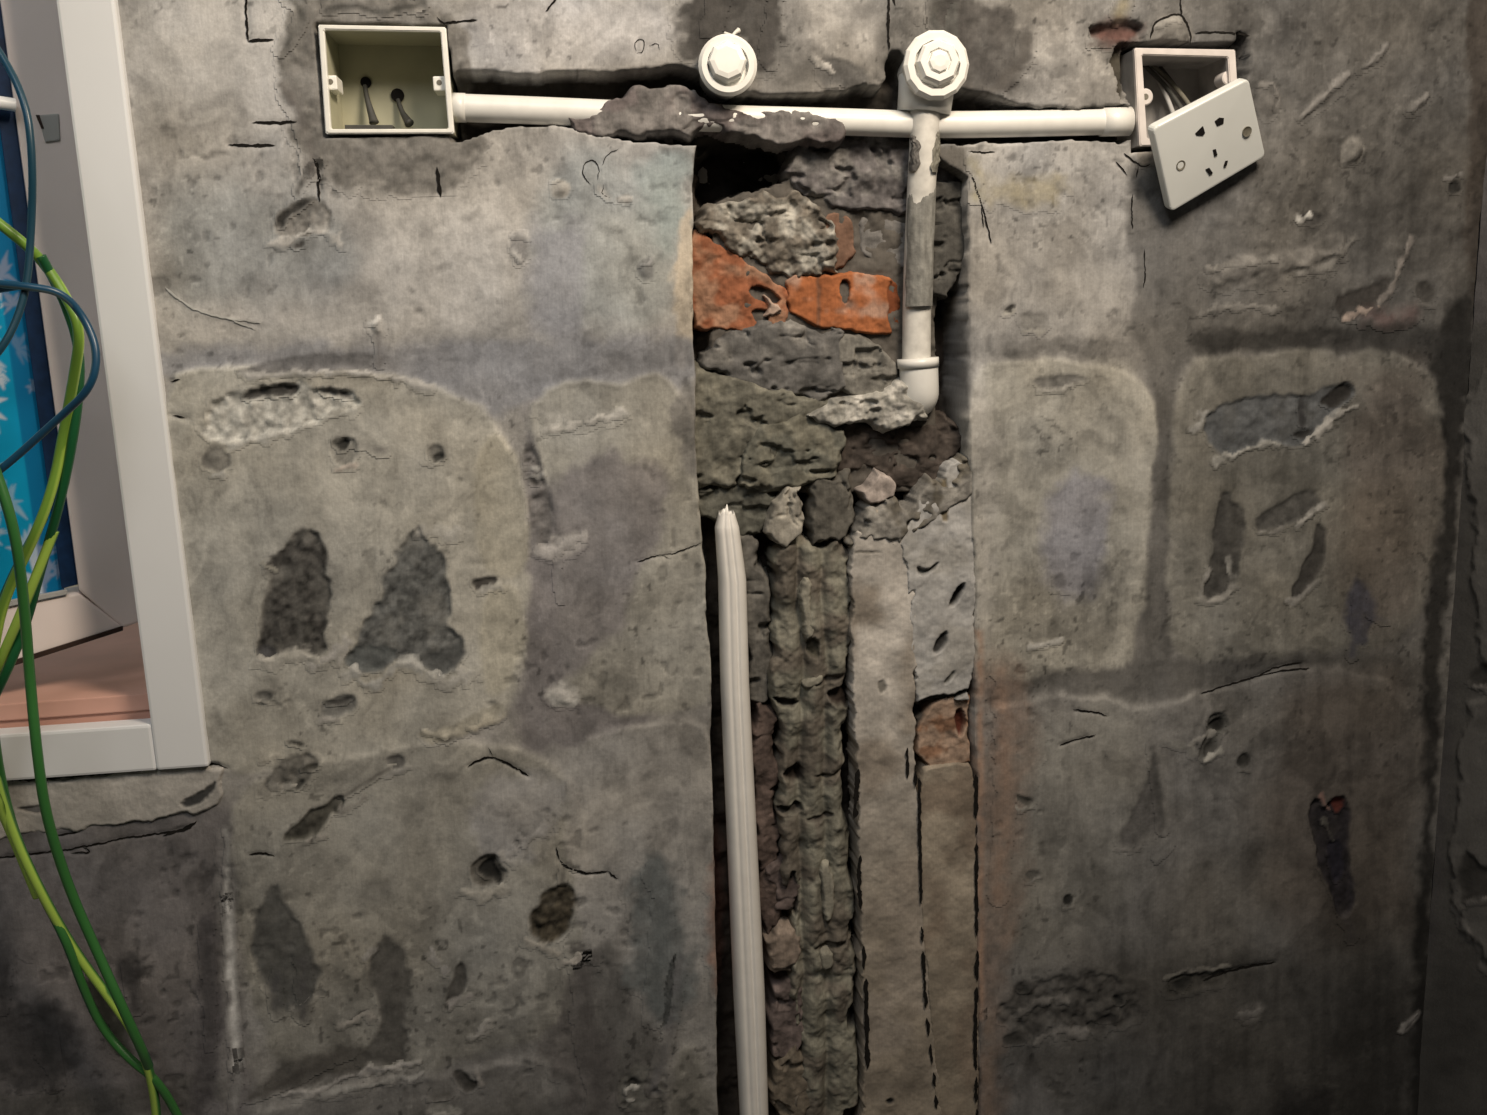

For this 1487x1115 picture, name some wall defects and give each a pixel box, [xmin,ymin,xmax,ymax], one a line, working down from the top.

flaking render [194,314,438,481]
peeling [1186,379,1359,470]
peeling [1194,486,1330,609]
peeling [248,517,508,726]
peeling [415,700,508,747]
crack [1202,662,1308,693]
peeling [254,737,413,846]
flaking render [519,859,604,970]
flaking render [1306,789,1360,946]
flaking render [1449,847,1487,943]
crack [1203,962,1274,981]